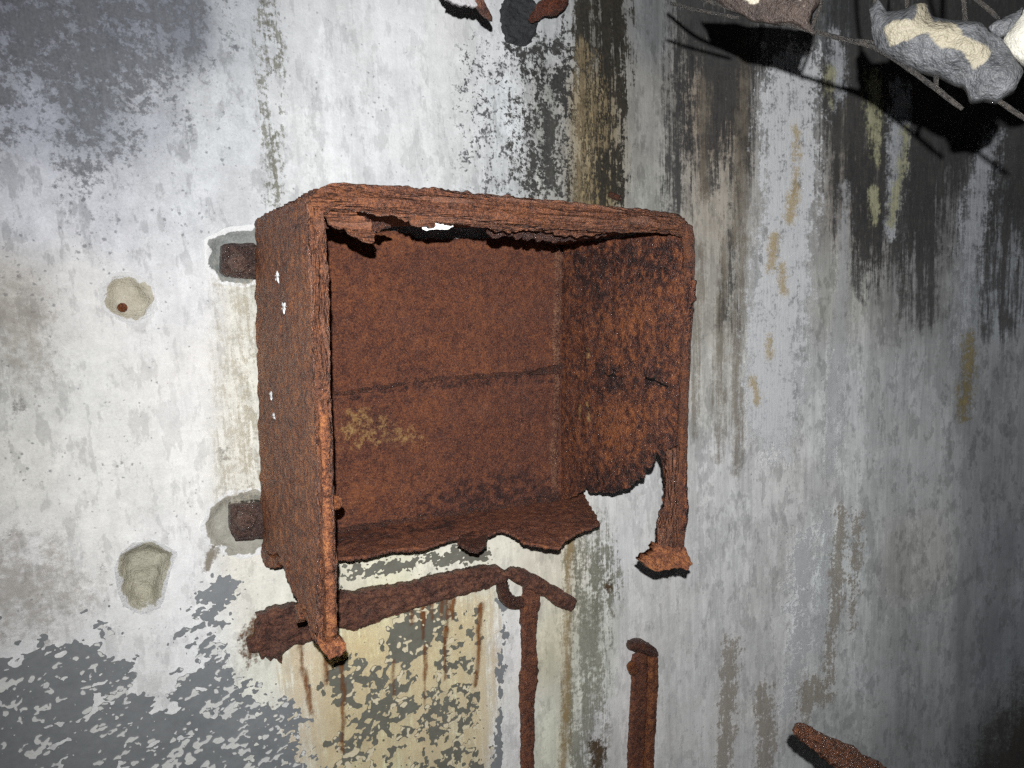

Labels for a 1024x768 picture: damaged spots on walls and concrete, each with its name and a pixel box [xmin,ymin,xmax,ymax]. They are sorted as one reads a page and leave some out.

water stain [455,0,635,206]
spalling [98,272,157,326]
spalling [204,225,256,288]
water stain [660,0,1024,479]
peeling [0,488,510,768]
rust [300,645,312,712]
rust [324,654,346,752]
rust [411,597,456,682]
rust [474,603,483,686]
rust [588,739,607,768]
rust [626,638,659,768]
rust [792,722,887,768]